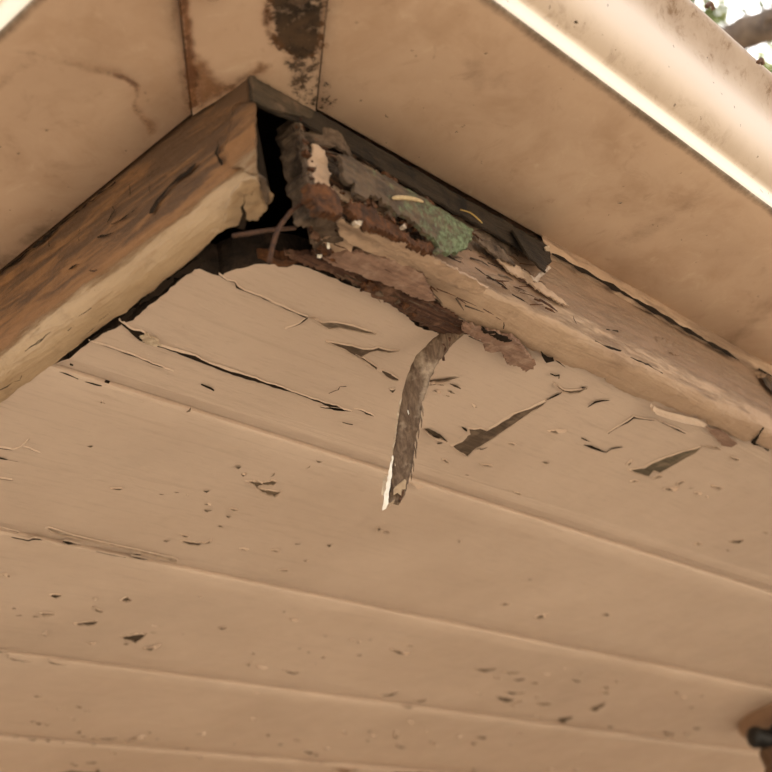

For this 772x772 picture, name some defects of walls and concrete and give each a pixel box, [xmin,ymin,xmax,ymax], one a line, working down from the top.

water stain [264,0,336,109]
peeling [224,101,270,223]
peeling [304,127,358,203]
peeling [321,217,489,295]
crack [434,247,527,303]
peeling [496,259,569,307]
crack [552,253,739,361]
peeling [325,340,400,393]
crack [541,351,610,407]
crack [596,329,663,374]
peeling [422,399,548,457]
peeling [625,403,740,483]